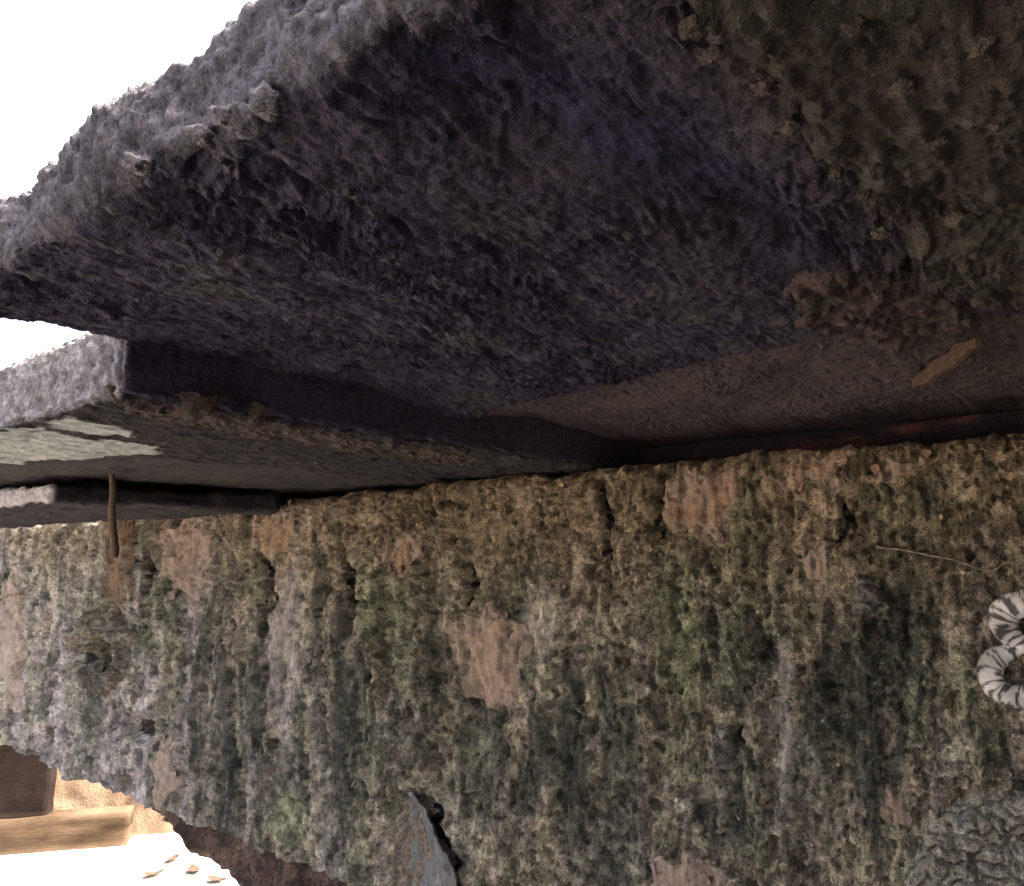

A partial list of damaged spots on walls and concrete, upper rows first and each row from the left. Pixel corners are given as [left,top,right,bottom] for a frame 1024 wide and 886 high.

peeling [661,463,742,548]
damp [269,558,366,761]
peeling [442,602,533,716]
damp [529,592,558,654]
damp [893,603,924,781]
peeling [408,791,463,886]